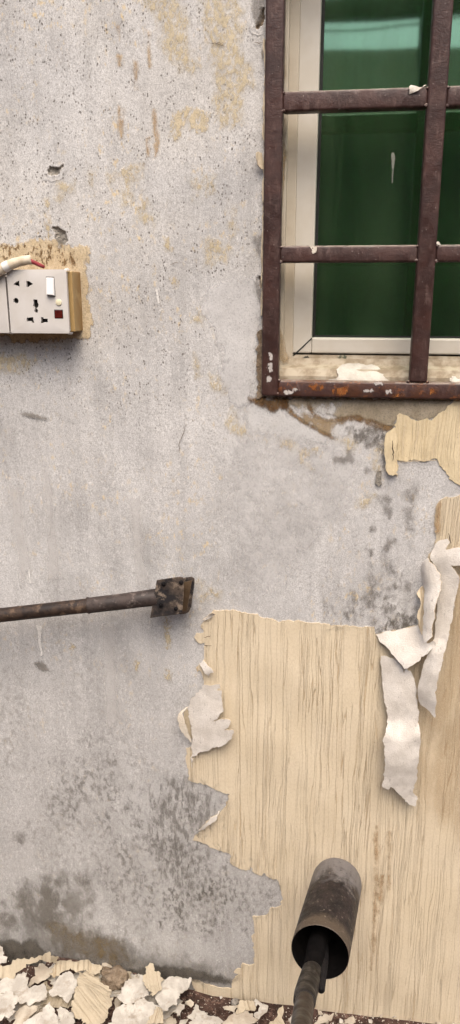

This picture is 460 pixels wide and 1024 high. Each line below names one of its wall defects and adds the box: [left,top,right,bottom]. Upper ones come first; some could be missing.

rust [248,397,289,412]
leakage [288,405,392,446]
leakage [369,583,417,630]
peeling [177,660,234,766]
peeling [377,539,460,806]
leakage [152,781,209,886]
leakage [17,878,156,971]